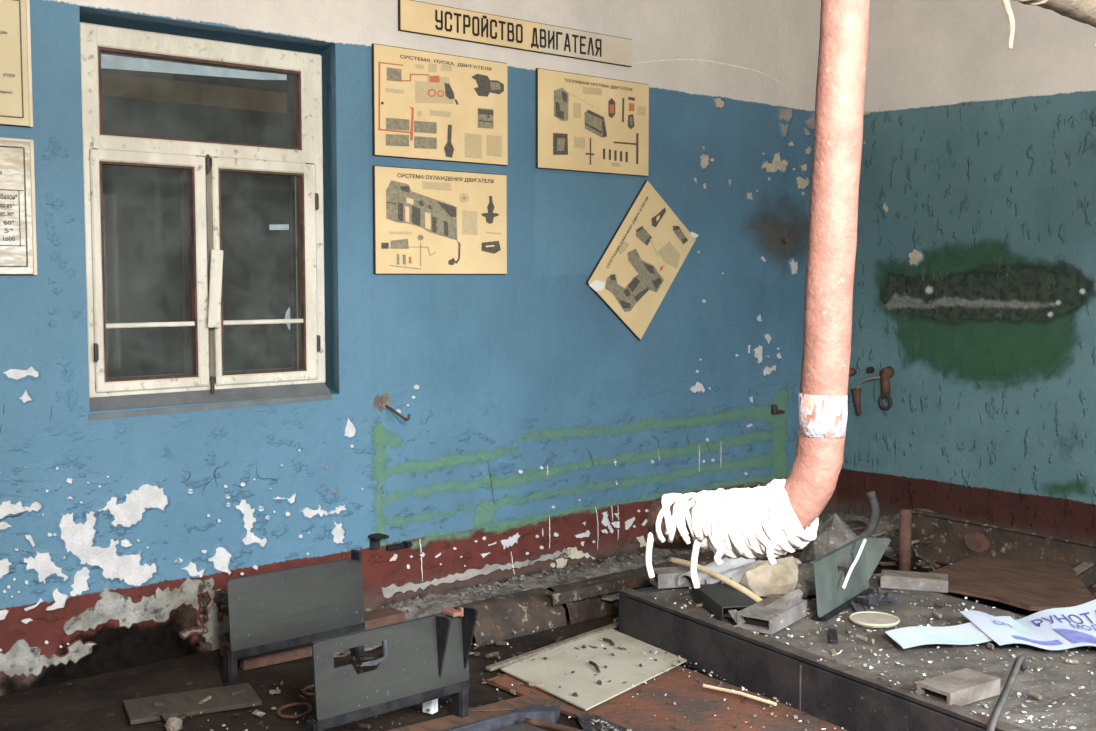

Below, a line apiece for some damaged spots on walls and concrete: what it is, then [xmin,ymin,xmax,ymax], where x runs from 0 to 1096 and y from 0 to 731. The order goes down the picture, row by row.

peeling [712,95,725,110]
peeling [693,144,715,190]
peeling [745,104,815,202]
peeling [906,247,925,267]
peeling [0,362,42,405]
peeling [0,466,349,679]
peeling [380,508,654,599]